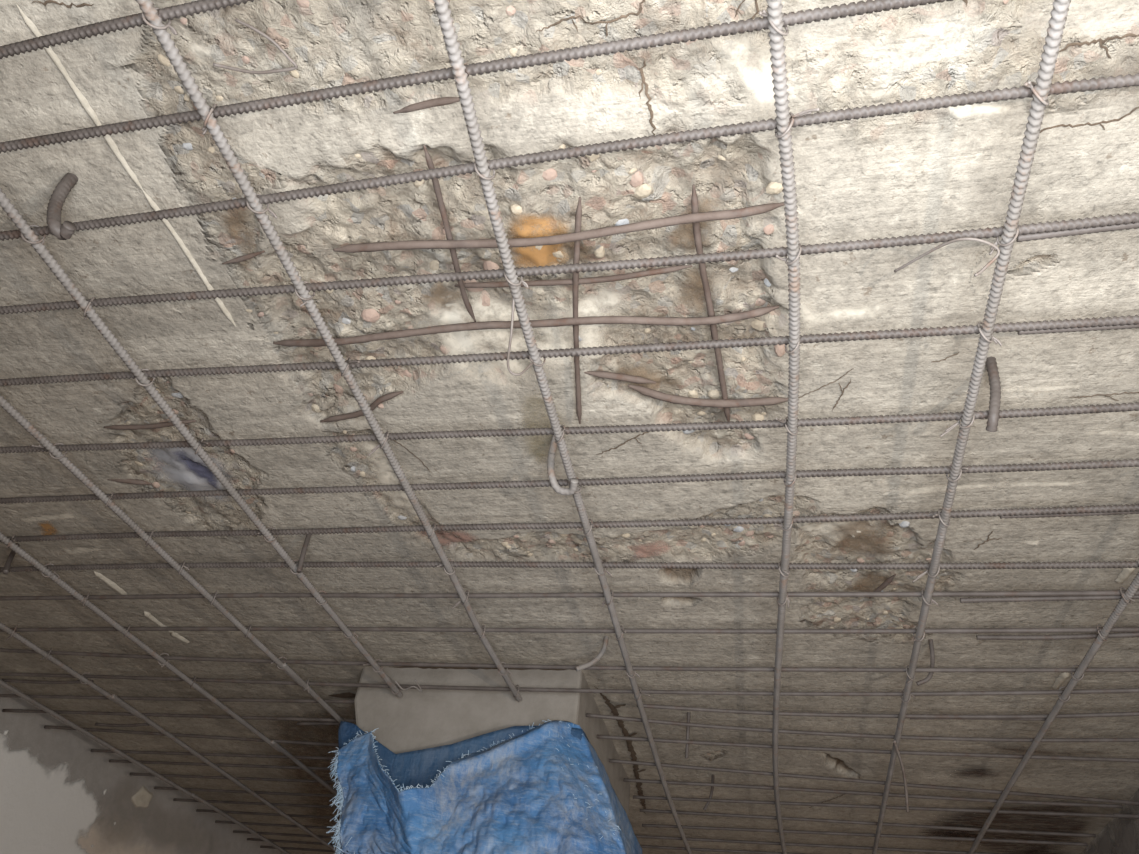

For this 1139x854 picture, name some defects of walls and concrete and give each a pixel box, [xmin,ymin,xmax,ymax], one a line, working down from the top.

crack [535,0,645,38]
crack [1059,33,1139,59]
crack [1040,107,1139,133]
corrosion [515,218,561,267]
spalling [61,0,1139,655]
peeling [0,730,107,854]
spalling [131,785,153,809]
water stain [923,806,1084,854]